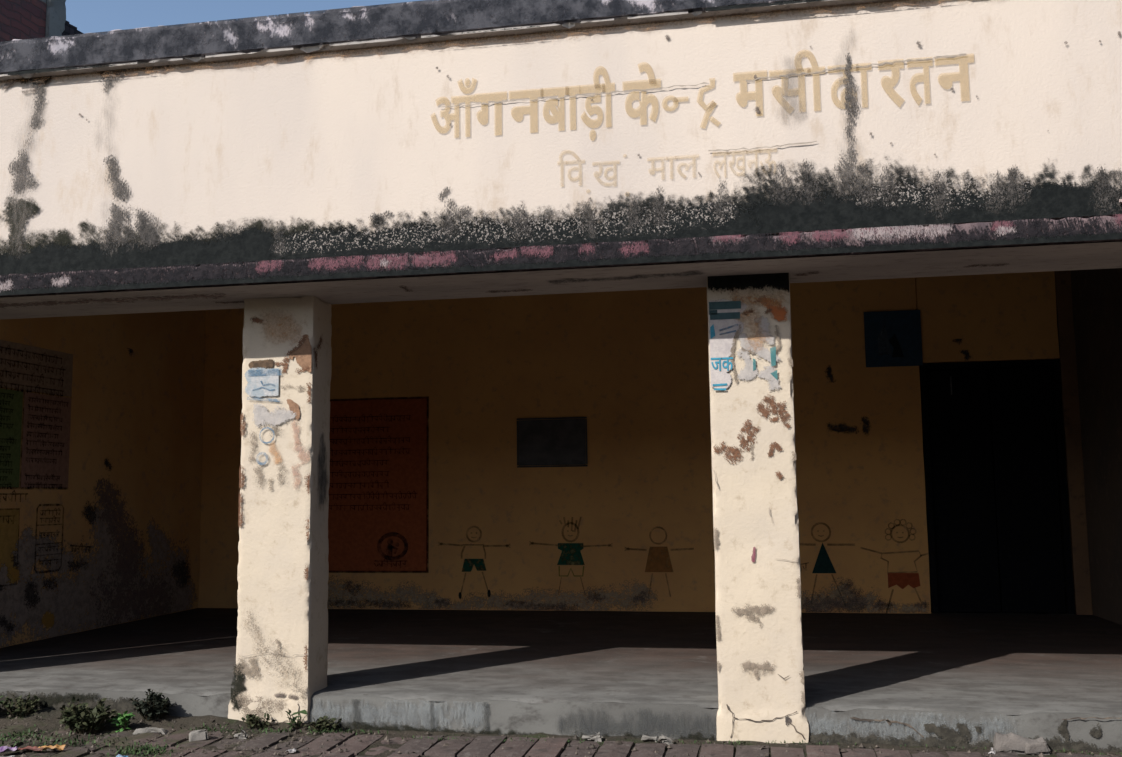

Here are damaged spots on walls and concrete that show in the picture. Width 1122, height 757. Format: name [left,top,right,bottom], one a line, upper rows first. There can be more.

leakage [0,0,1122,308]
flaking render [238,334,322,528]
peeling [713,395,796,464]
leakage [0,459,196,647]
leakage [230,611,543,735]
crack [726,704,805,739]